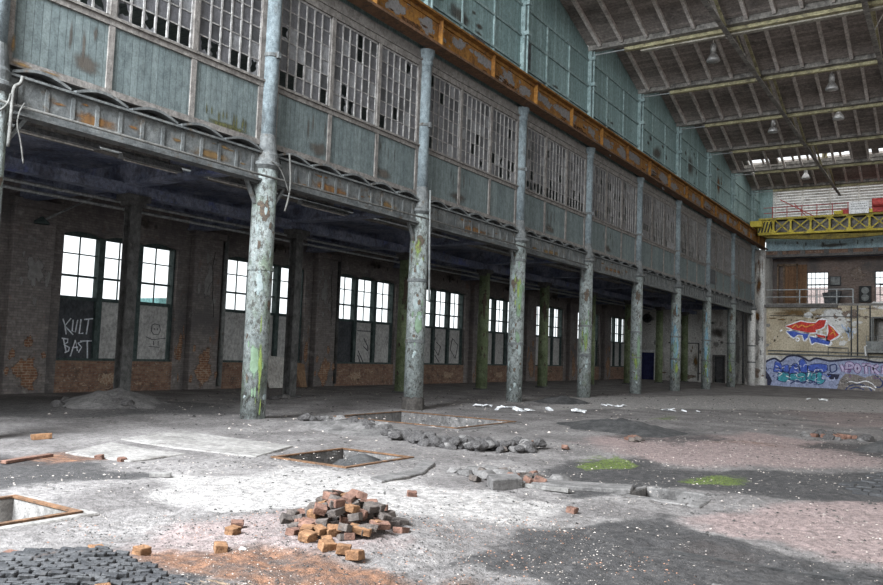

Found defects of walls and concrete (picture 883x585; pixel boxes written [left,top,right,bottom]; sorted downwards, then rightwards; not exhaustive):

peeling [256,195,275,250]
peeling [254,270,272,295]
peeling [243,334,266,401]